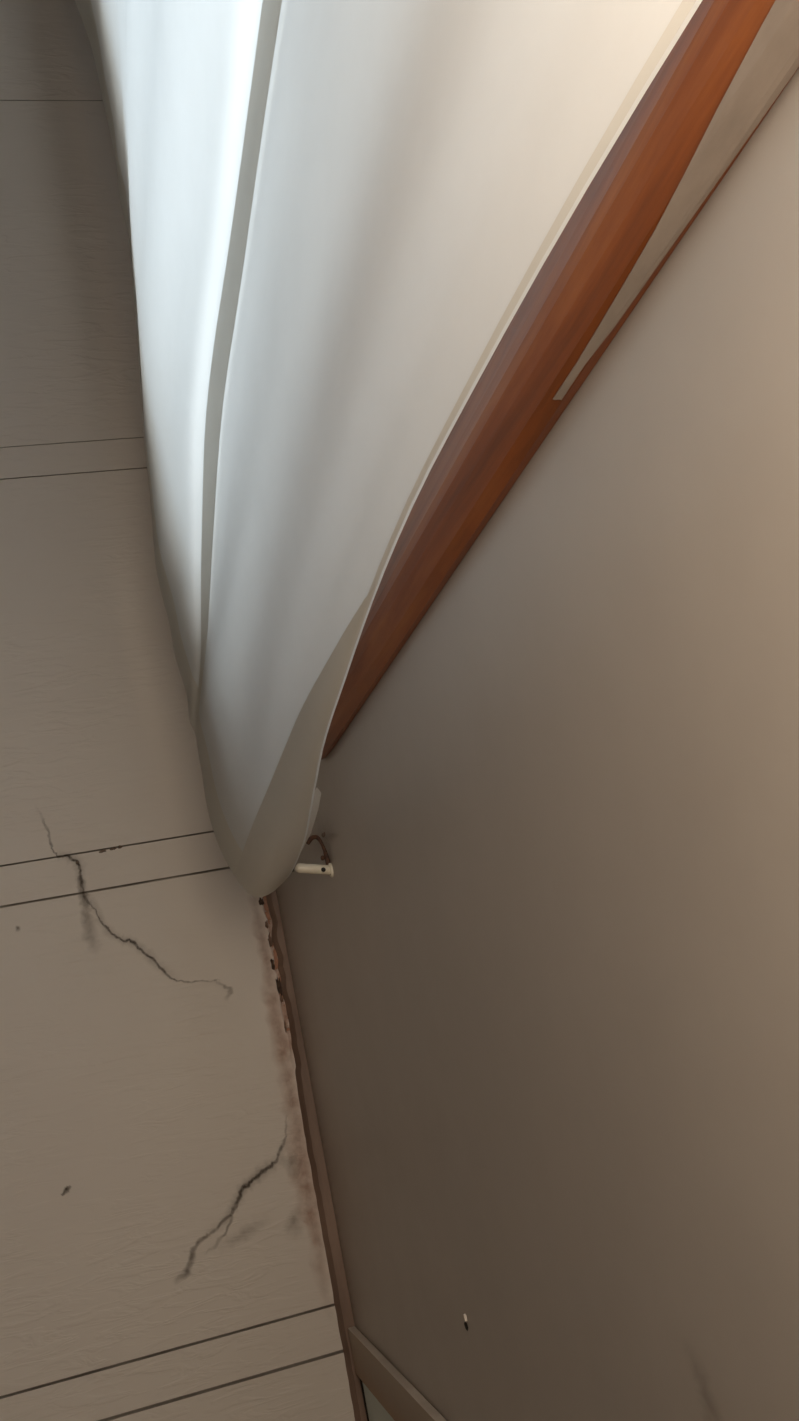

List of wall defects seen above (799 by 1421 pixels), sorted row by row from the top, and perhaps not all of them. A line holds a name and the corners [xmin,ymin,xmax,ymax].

peeling [553,0,799,400]
crack [236,1162,273,1203]